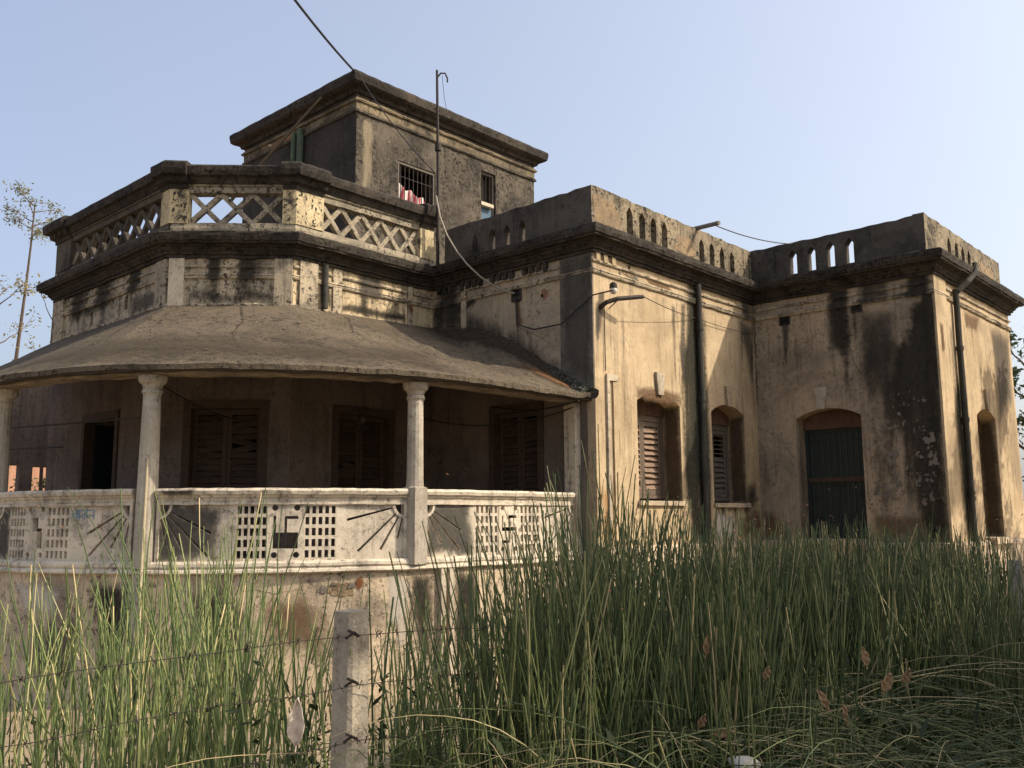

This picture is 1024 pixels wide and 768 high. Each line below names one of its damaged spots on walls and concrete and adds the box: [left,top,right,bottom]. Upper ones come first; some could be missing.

leakage [195,259,221,300]
leakage [237,259,262,299]
leakage [827,275,945,540]
peeling [869,390,940,510]
leakage [979,334,1011,536]
leakage [158,490,219,561]
flaking render [321,582,355,597]